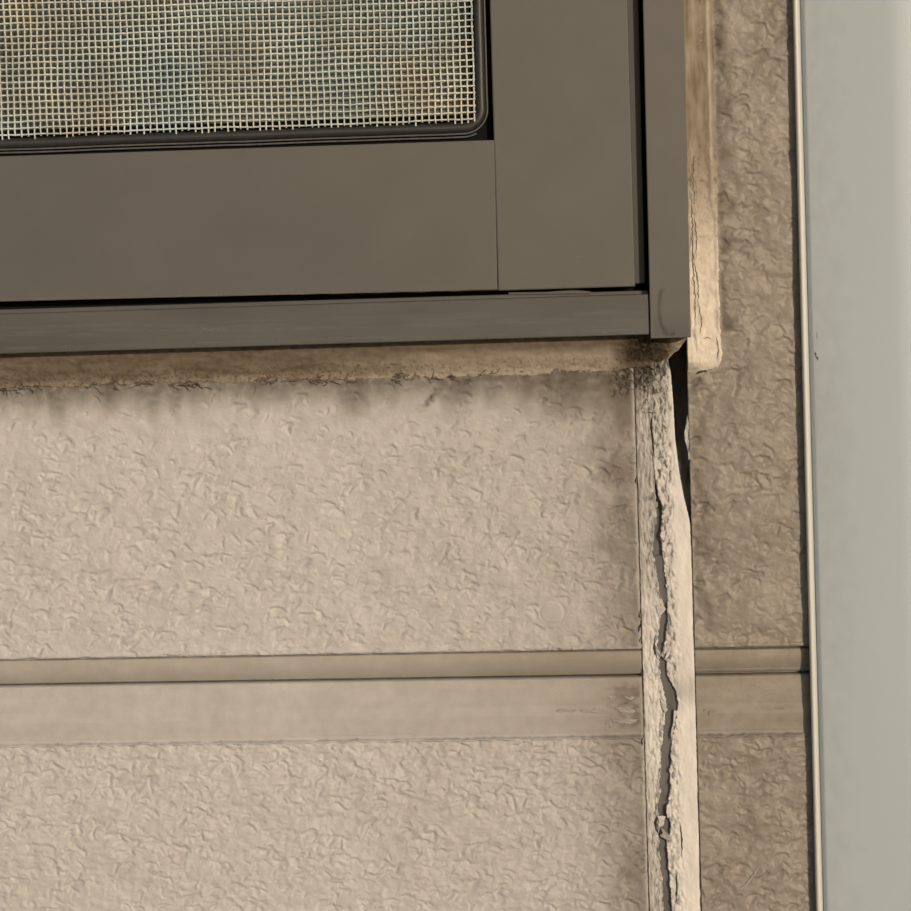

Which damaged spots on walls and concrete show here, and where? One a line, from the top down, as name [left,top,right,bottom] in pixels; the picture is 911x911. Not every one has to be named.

water stain [539,341,663,385]
crack [633,157,719,911]